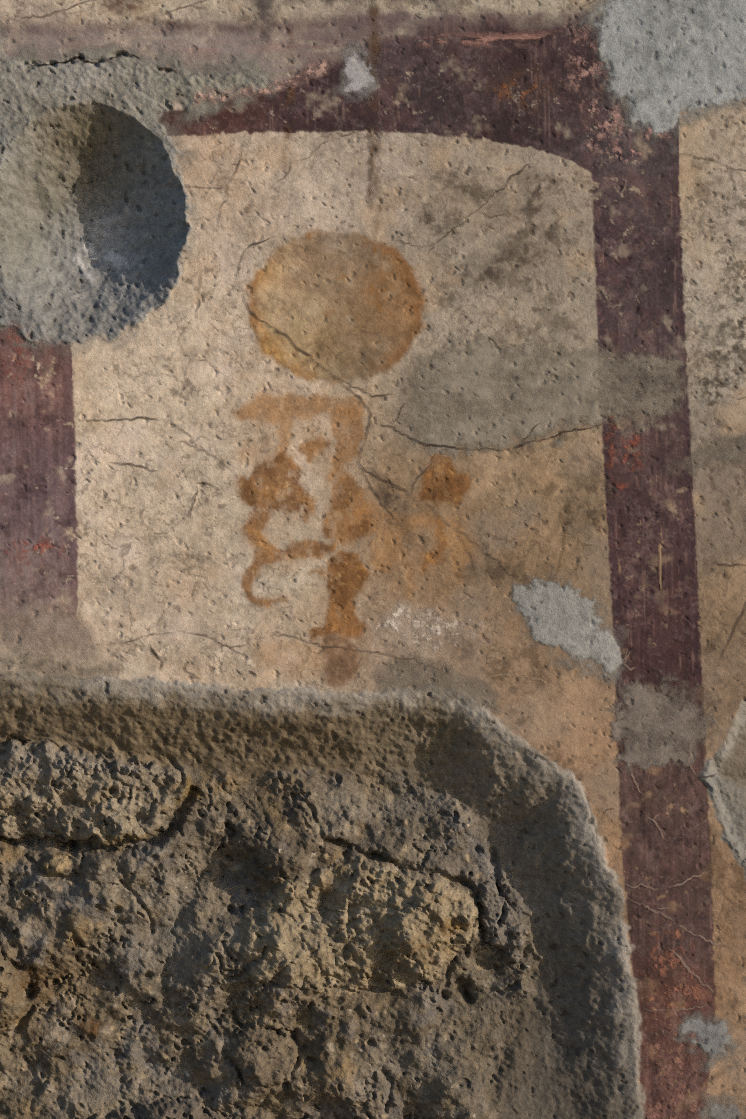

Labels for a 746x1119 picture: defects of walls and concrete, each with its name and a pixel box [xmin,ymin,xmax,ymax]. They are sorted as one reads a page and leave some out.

crack [246,303,311,356]
crack [347,383,456,511]
spalling [0,643,703,1119]